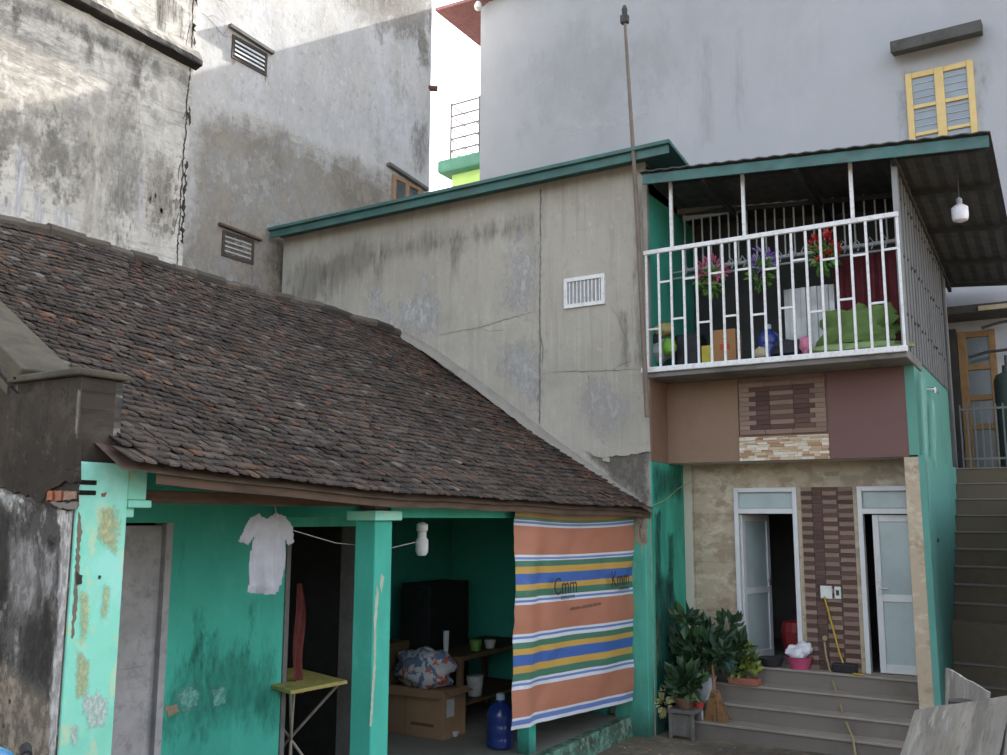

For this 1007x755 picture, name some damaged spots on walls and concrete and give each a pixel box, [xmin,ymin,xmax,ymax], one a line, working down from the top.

damp [0,93,138,238]
crack [174,0,228,265]
damp [184,114,415,293]
crack [441,189,638,424]
damp [0,489,24,600]
damp [0,594,52,755]
peeling [10,469,89,755]
peeling [72,654,109,744]
peeling [98,575,109,615]
peeling [99,509,120,553]